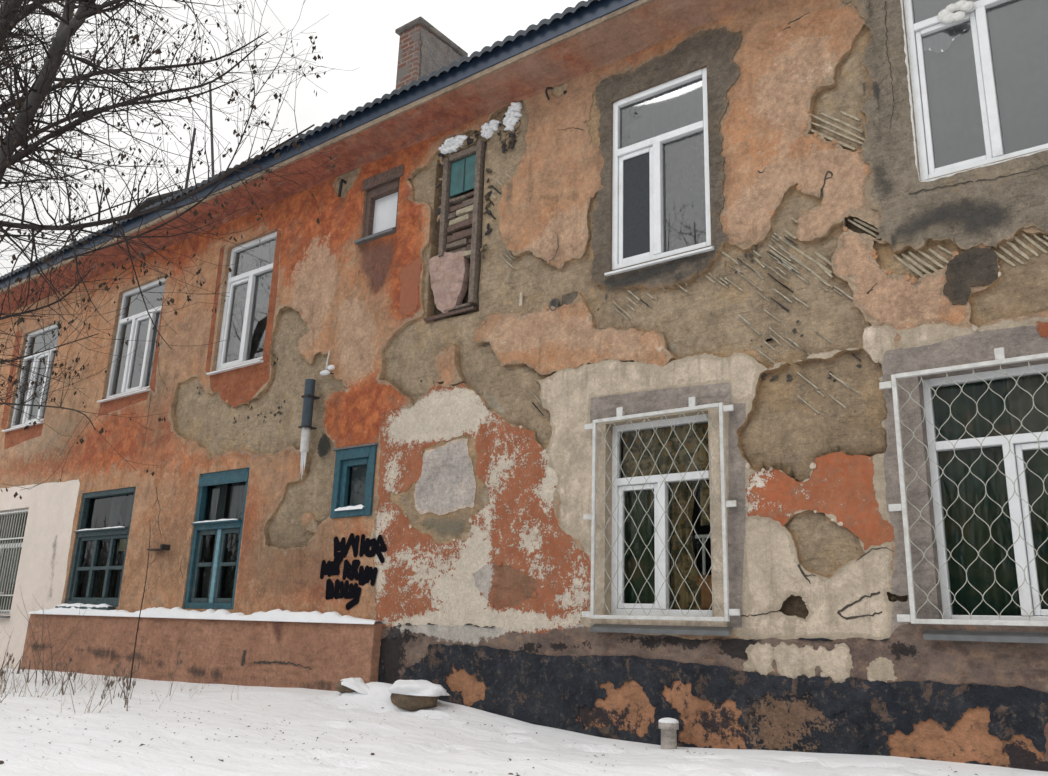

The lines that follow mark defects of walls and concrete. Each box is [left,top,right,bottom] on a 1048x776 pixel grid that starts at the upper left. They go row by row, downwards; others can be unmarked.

spalling [807,21,873,153]
spalling [584,91,600,145]
crack [908,165,1048,195]
damp [891,201,1005,246]
spalling [373,100,966,684]
spalling [170,306,347,551]
crack [837,591,882,620]